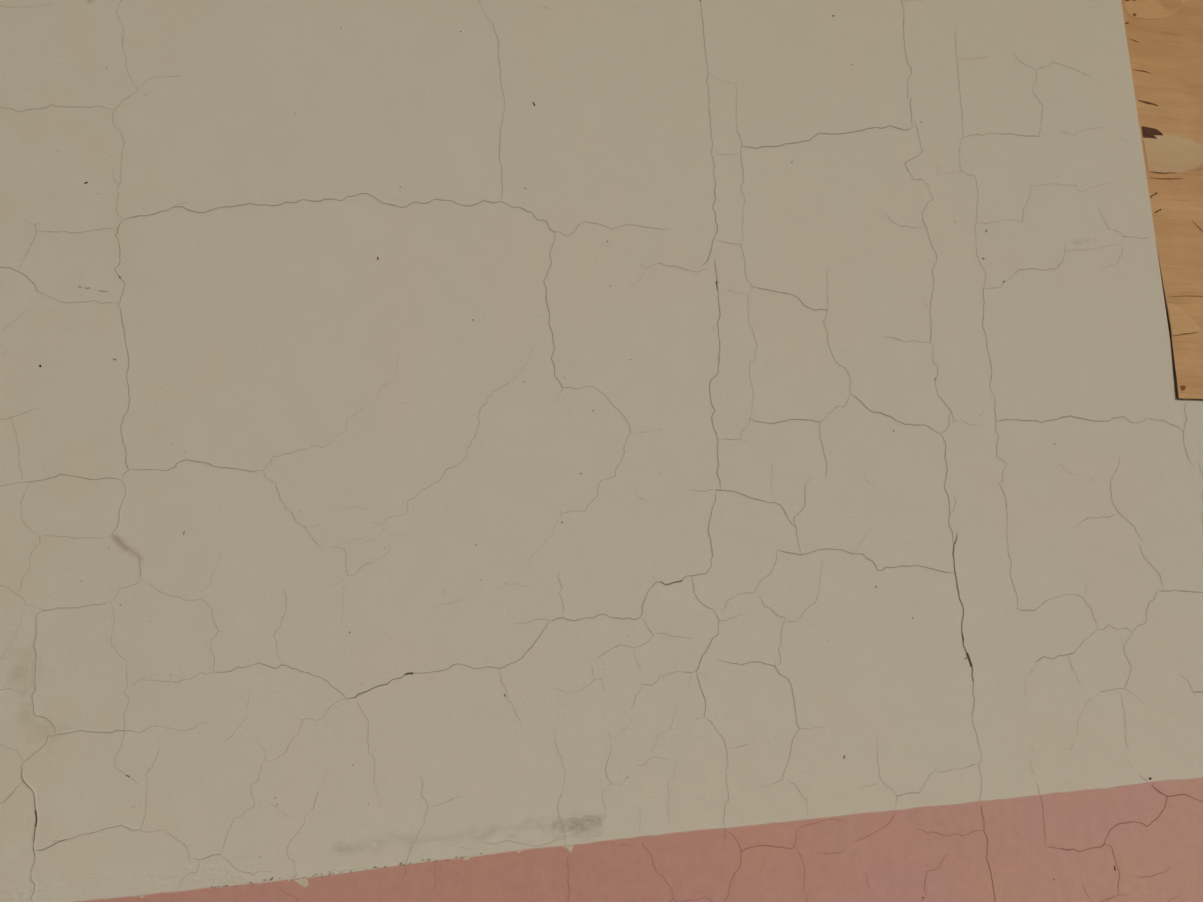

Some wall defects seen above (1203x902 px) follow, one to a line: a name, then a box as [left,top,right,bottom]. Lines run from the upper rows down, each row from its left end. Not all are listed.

crack [0,0,417,902]
crack [406,0,983,820]
crack [937,34,1203,523]
crack [1007,459,1203,750]
crack [402,727,570,899]
crack [723,781,842,902]
crack [917,806,996,902]
crack [1030,744,1203,902]